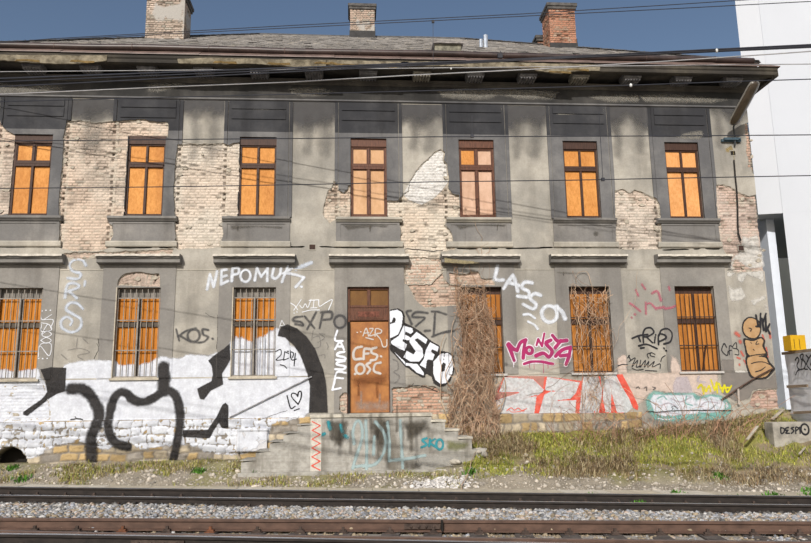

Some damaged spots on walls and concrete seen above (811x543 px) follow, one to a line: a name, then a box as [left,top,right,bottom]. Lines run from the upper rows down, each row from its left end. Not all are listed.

flaking render [0,122,15,215]
flaking render [59,119,240,260]
flaking render [323,181,350,223]
flaking render [387,149,495,308]
flaking render [615,189,662,250]
flaking render [716,184,766,273]
flaking render [392,384,452,414]